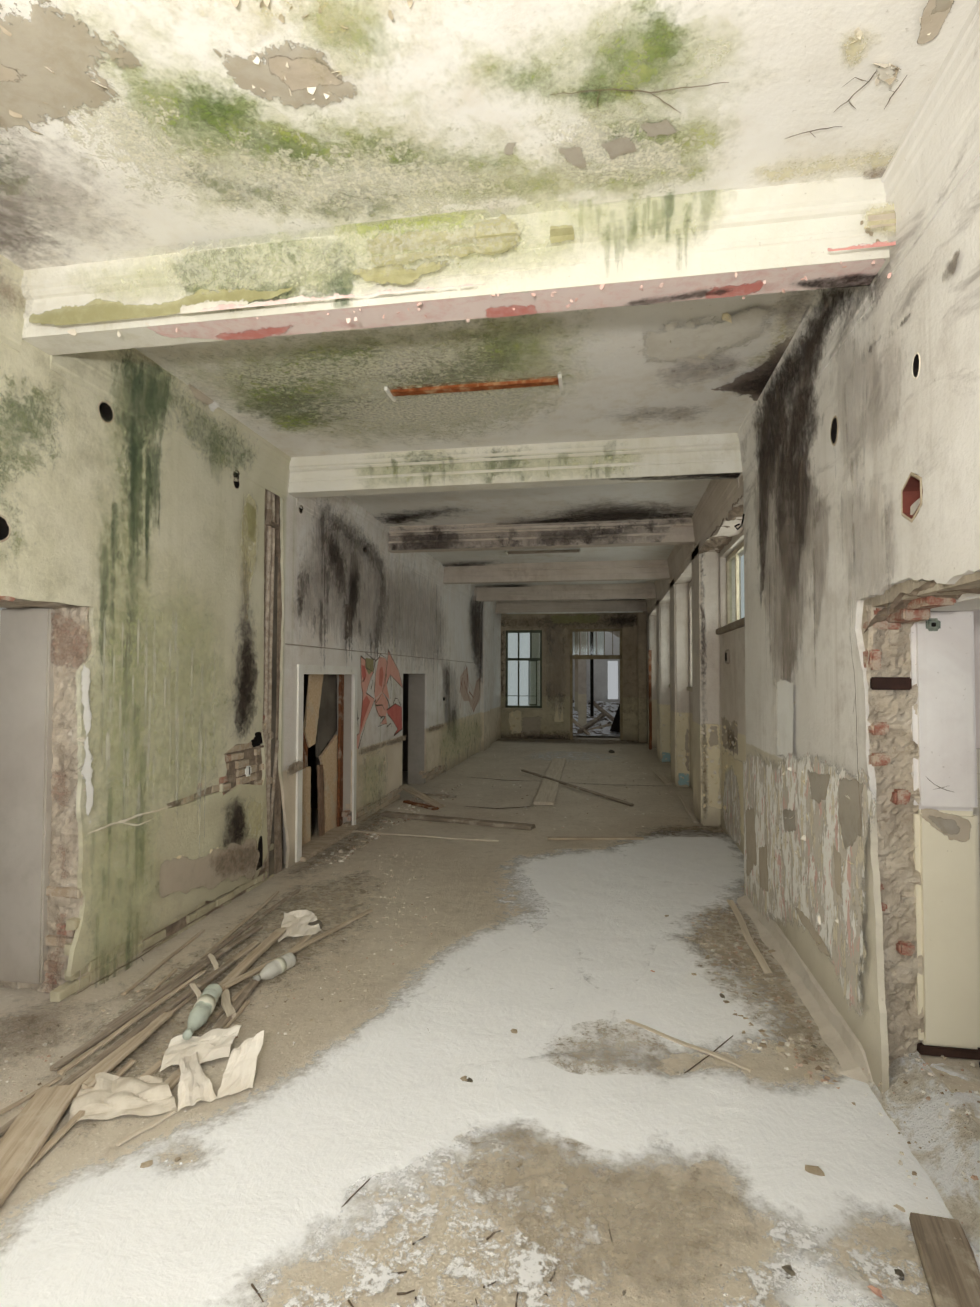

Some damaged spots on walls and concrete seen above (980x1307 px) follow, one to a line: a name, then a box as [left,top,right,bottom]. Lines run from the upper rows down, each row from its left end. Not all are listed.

peeling [0,0,142,140]
peeling [213,40,358,109]
peeling [917,0,954,44]
leakage [55,19,714,306]
leakage [0,377,61,474]
leakage [235,497,257,735]
leakage [298,505,386,663]
leakage [538,519,685,546]
leakage [759,332,822,597]
spalling [0,596,274,1002]
spalling [167,715,303,808]
spalling [660,580,980,1068]